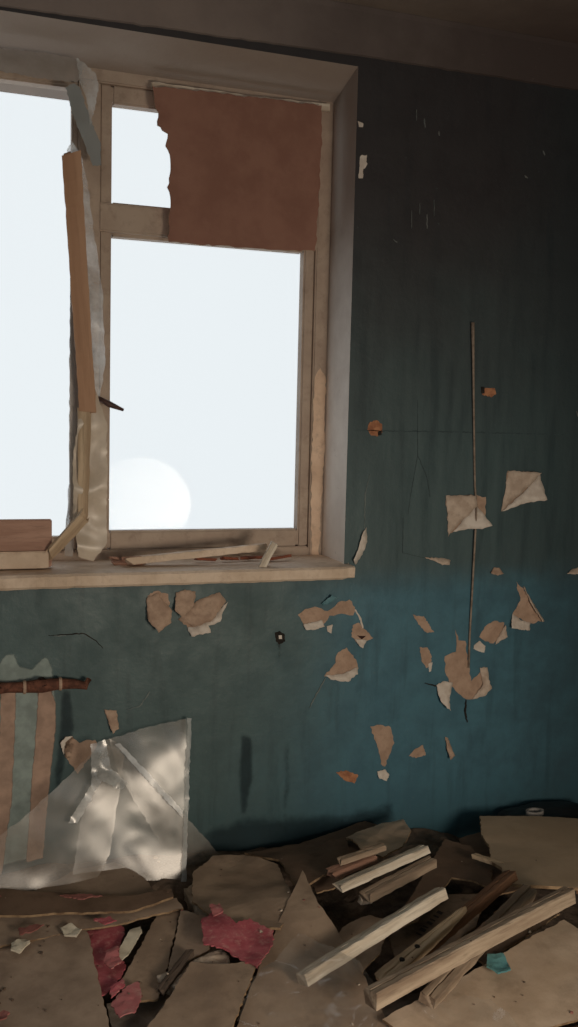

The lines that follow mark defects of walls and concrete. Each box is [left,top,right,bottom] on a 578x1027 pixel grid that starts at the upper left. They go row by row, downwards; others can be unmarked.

peeling [501,470,547,511]
peeling [446,494,493,536]
peeling [146,590,228,637]
peeling [413,615,434,633]
peeling [298,595,373,708]
peeling [420,583,544,722]
peeling [370,725,394,781]
peeling [409,745,426,758]